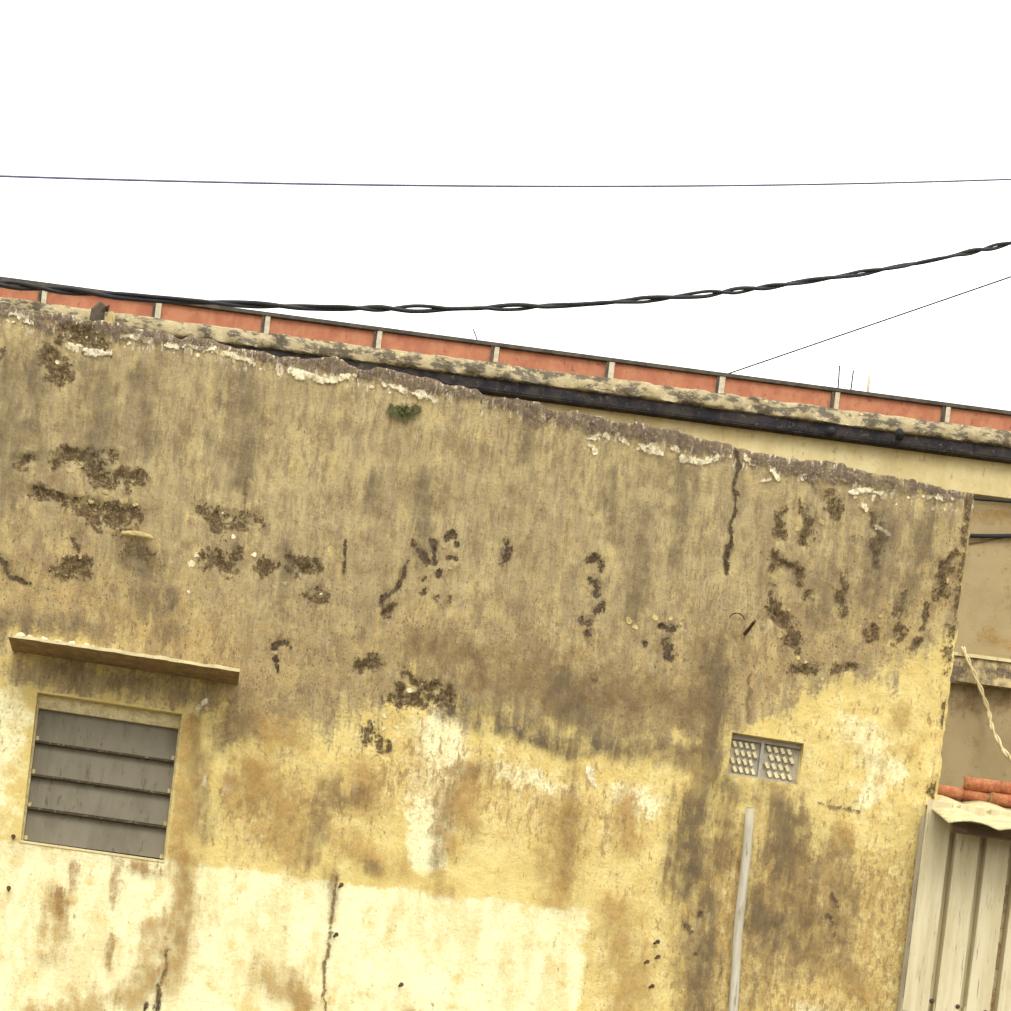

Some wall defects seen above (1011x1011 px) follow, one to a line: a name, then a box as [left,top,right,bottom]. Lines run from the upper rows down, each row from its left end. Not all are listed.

flaking render [12,443,150,540]
flaking render [188,495,331,604]
flaking render [411,528,460,603]
flaking render [578,552,606,638]
peeling [587,431,724,465]
crack [724,449,745,575]
flaking render [764,584,859,681]
flaking render [767,487,891,603]
flaking render [863,493,973,676]
flaking render [360,666,457,754]
damp [463,631,739,1011]
damp [749,779,861,979]